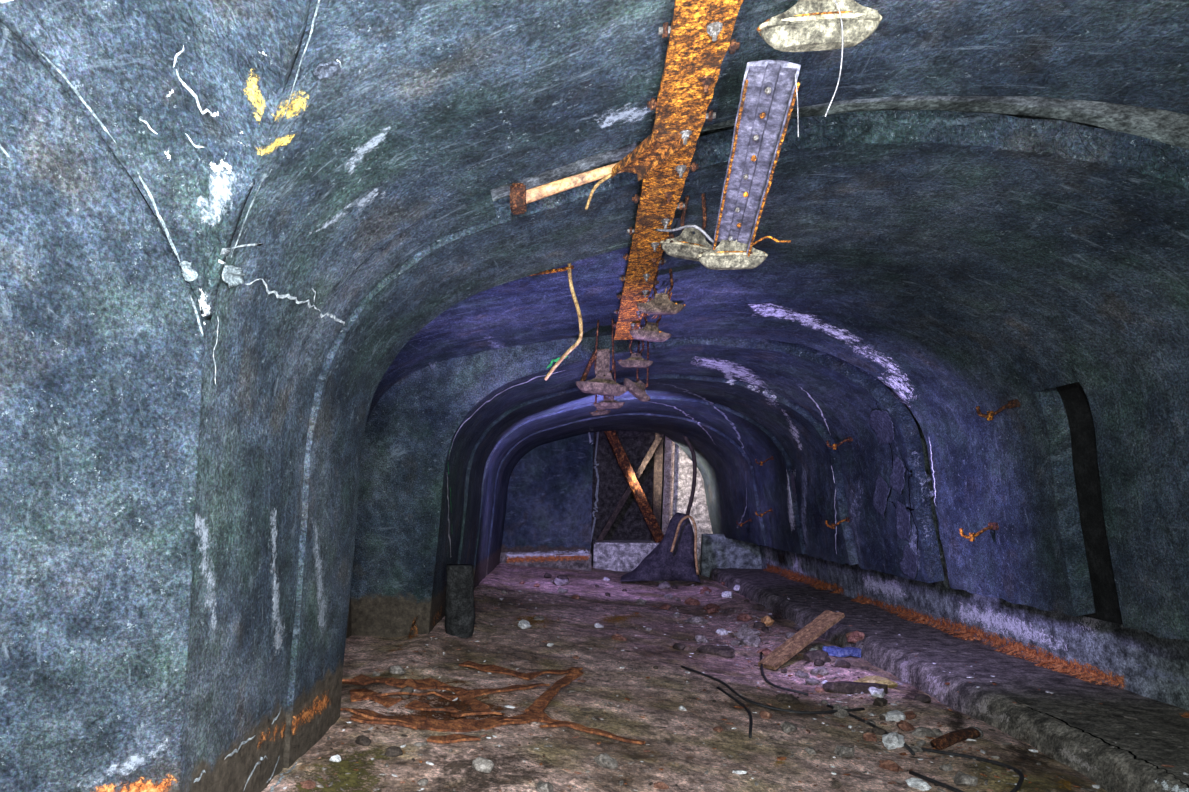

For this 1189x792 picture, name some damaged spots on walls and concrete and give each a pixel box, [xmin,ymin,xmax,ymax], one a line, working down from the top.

efflorescence [197,173,234,225]
rust [663,80,800,257]
rust [762,564,1124,689]
rust [93,775,177,792]
crack [1019,703,1189,788]